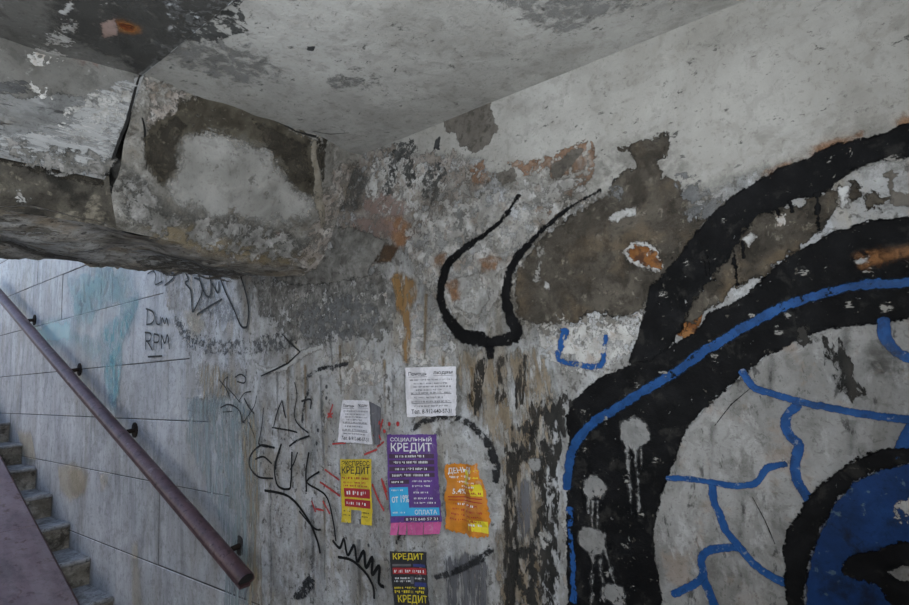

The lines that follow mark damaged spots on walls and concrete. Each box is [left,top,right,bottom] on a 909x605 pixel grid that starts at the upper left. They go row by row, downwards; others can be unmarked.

water stain [121,96,327,254]
spalling [0,0,735,390]
rust [390,273,427,362]
water stain [446,347,577,605]